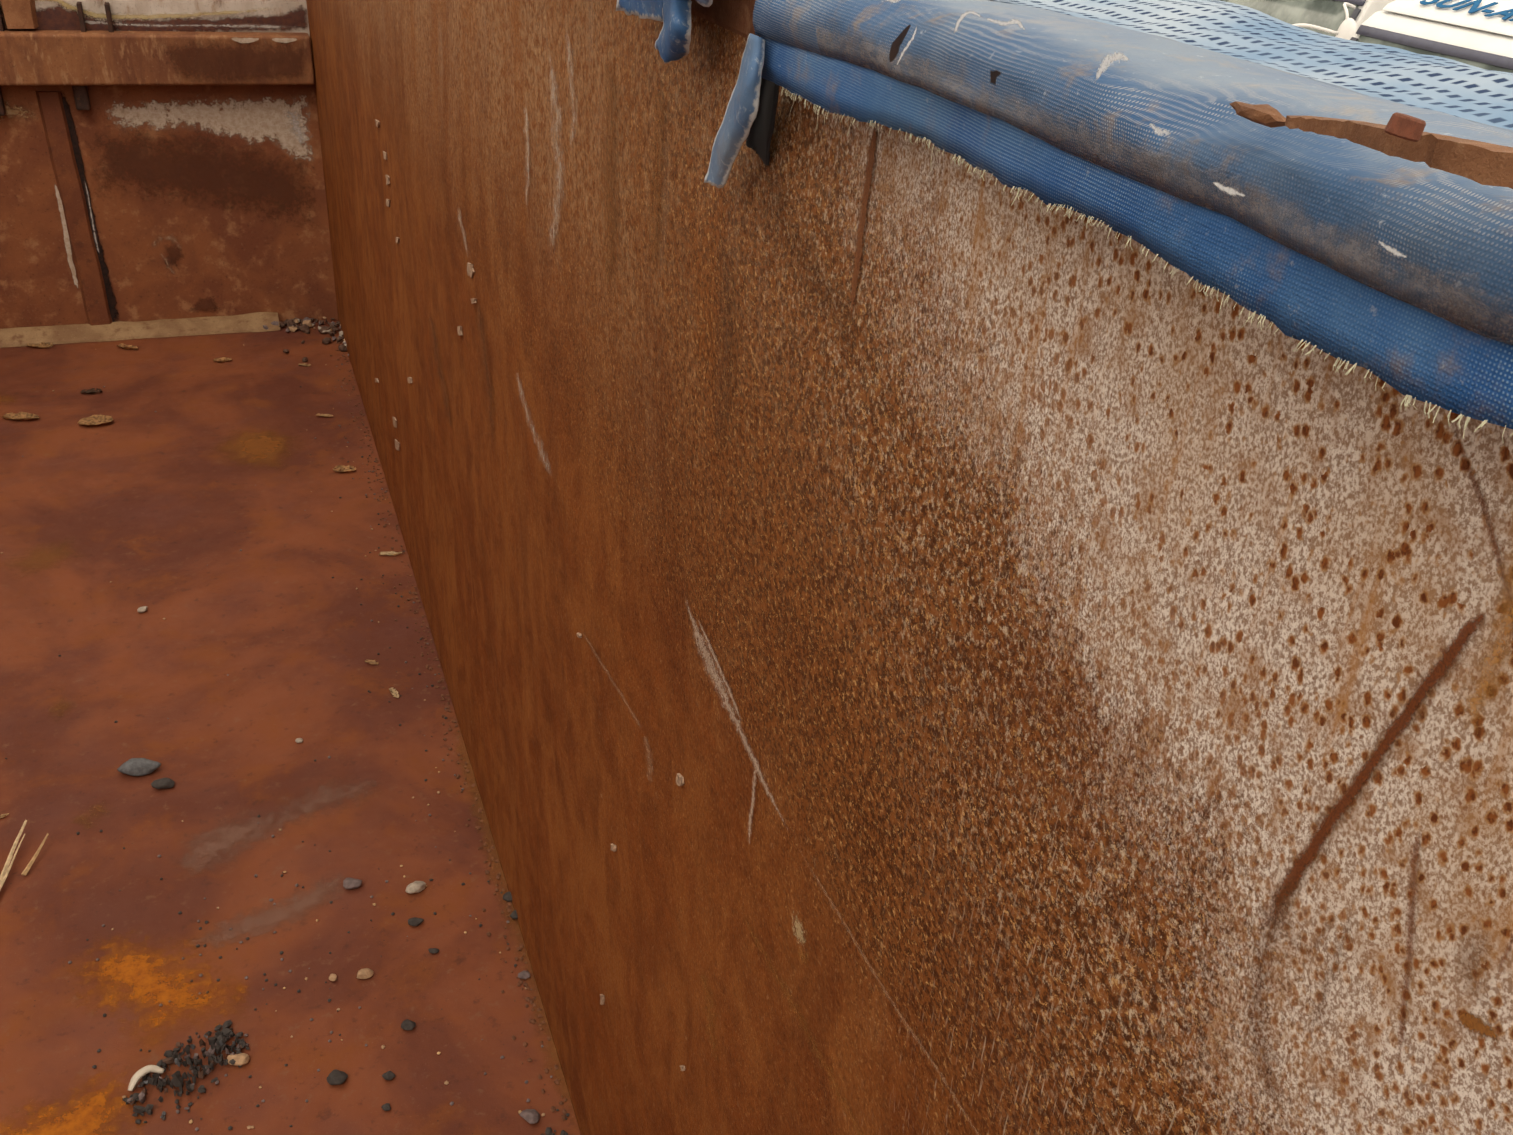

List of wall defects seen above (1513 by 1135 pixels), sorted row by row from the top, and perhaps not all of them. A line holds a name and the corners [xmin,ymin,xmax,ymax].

corrosion [0,0,307,80]
peeling [107,95,313,161]
corrosion [850,125,877,312]
corrosion [85,944,243,1027]
corrosion [1458,1011,1498,1042]
corrosion [0,1079,126,1135]